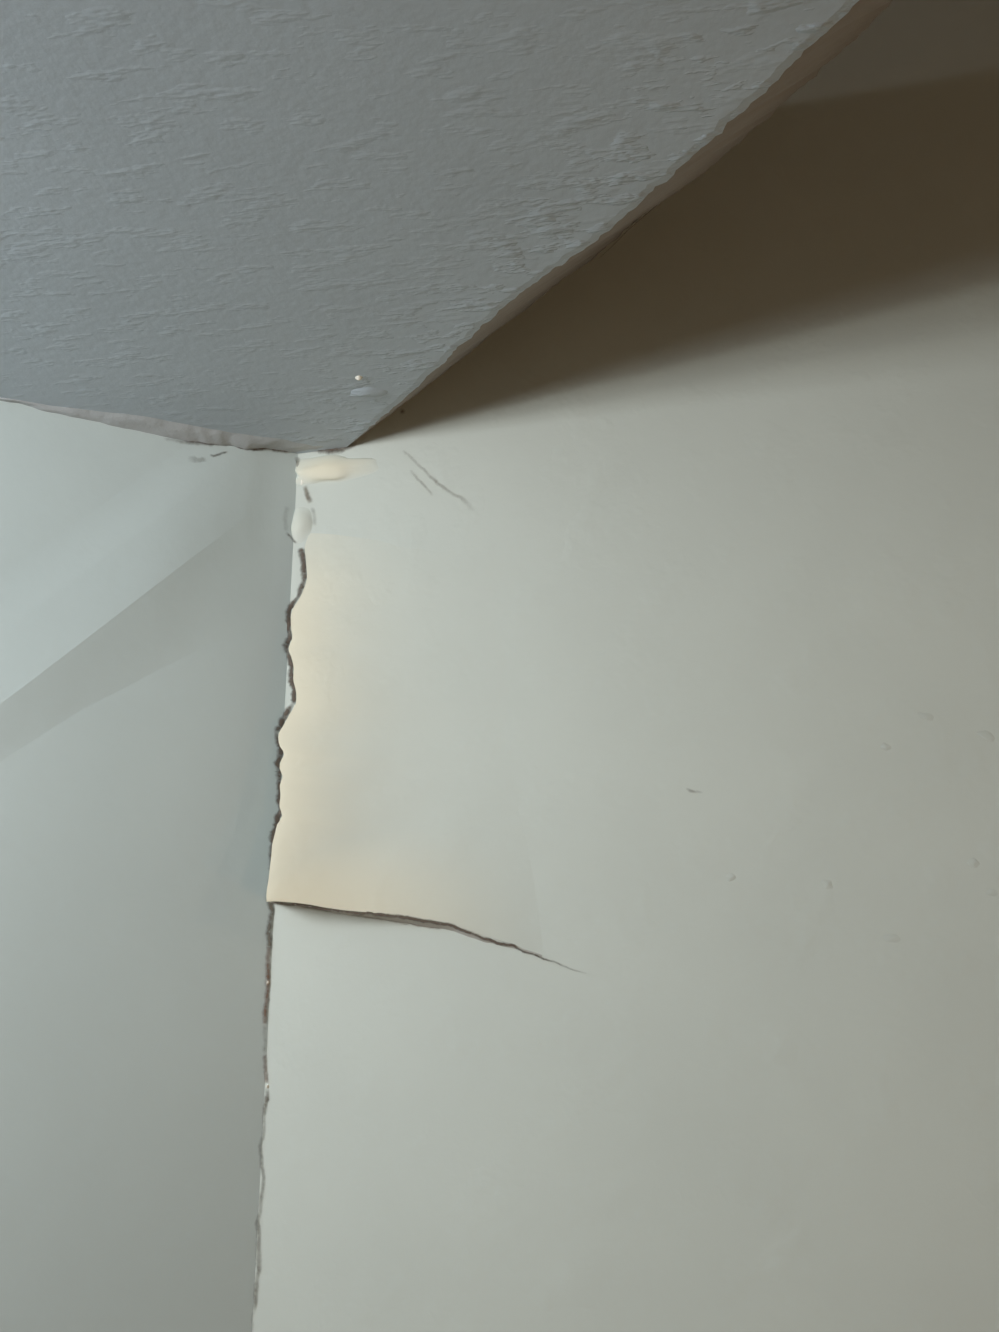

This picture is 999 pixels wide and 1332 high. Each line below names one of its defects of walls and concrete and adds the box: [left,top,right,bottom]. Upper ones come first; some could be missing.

crack [269,534,307,862]
crack [263,902,274,1023]
crack [262,1056,270,1112]